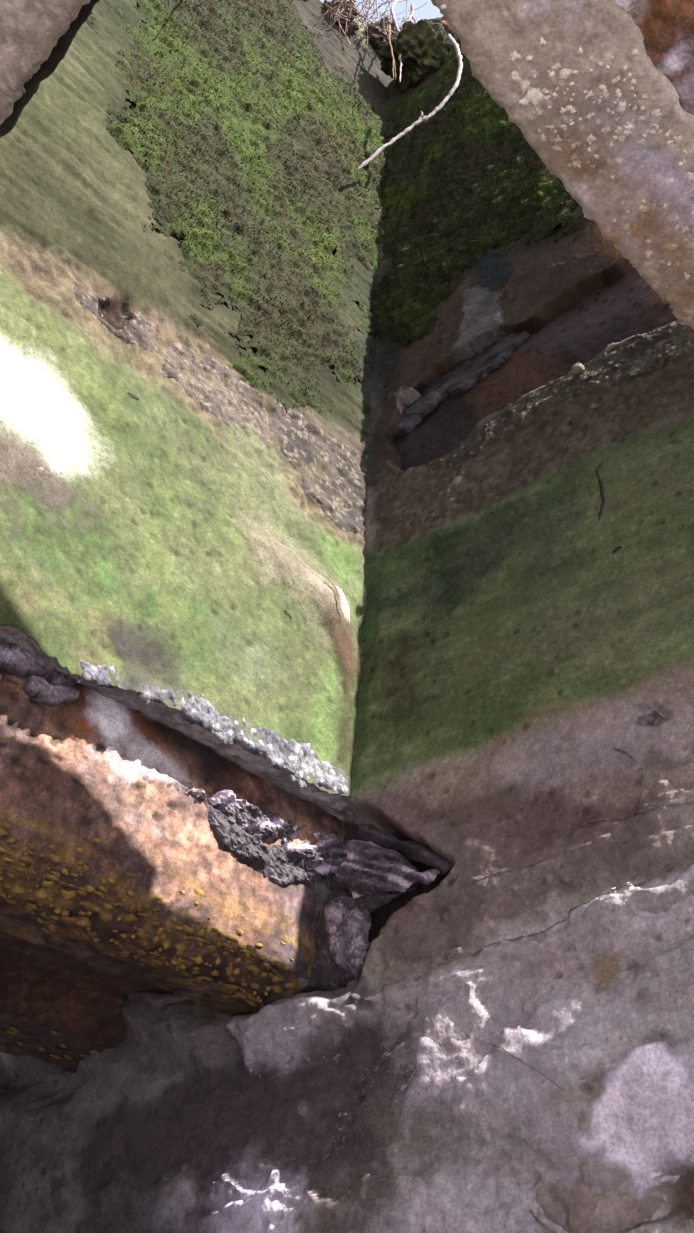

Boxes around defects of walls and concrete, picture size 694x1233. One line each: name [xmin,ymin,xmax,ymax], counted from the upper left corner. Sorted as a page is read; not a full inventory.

crack [363,868,670,995]